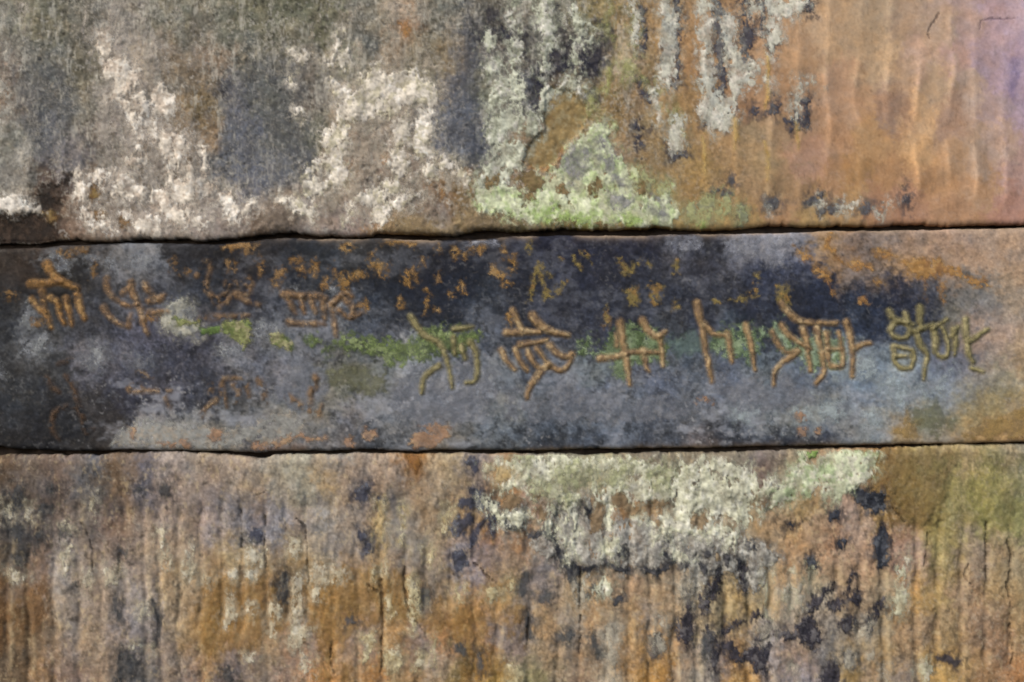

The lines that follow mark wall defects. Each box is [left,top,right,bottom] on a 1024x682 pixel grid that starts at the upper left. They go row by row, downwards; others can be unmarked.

damp [477,8,530,57]
damp [531,19,616,114]
damp [72,26,261,269]
damp [275,27,471,226]
damp [0,194,41,215]
damp [19,309,53,355]
damp [160,297,200,336]
damp [111,410,304,450]
damp [373,501,384,543]
damp [893,557,910,615]